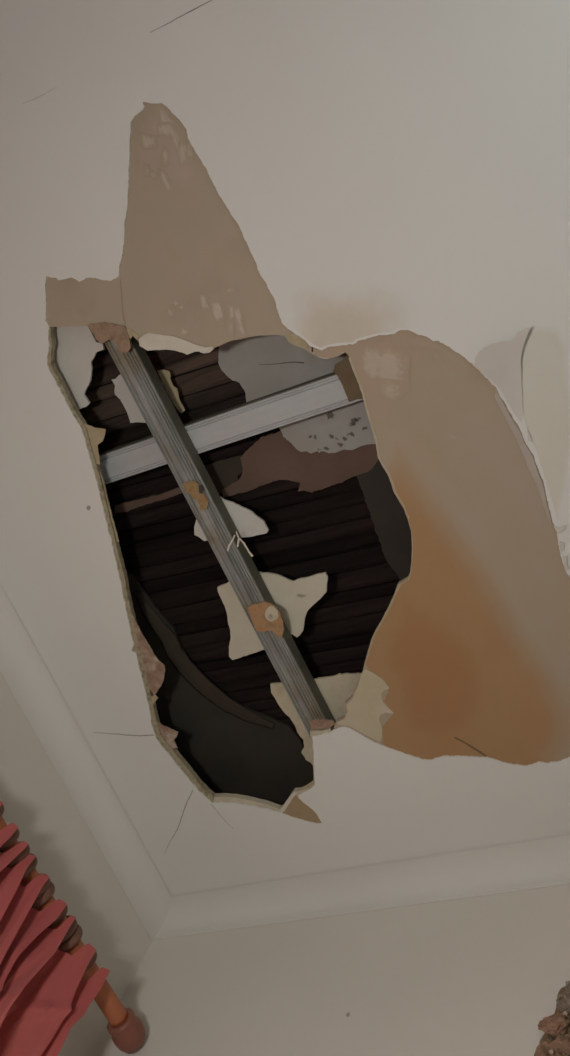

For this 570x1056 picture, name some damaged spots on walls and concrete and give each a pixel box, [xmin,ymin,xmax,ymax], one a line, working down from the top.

crack [150,0,212,33]
spalling [307,411,370,453]
peeling [474,327,532,442]
spalling [48,327,333,812]
damp [366,440,570,765]
spalling [534,981,570,1056]